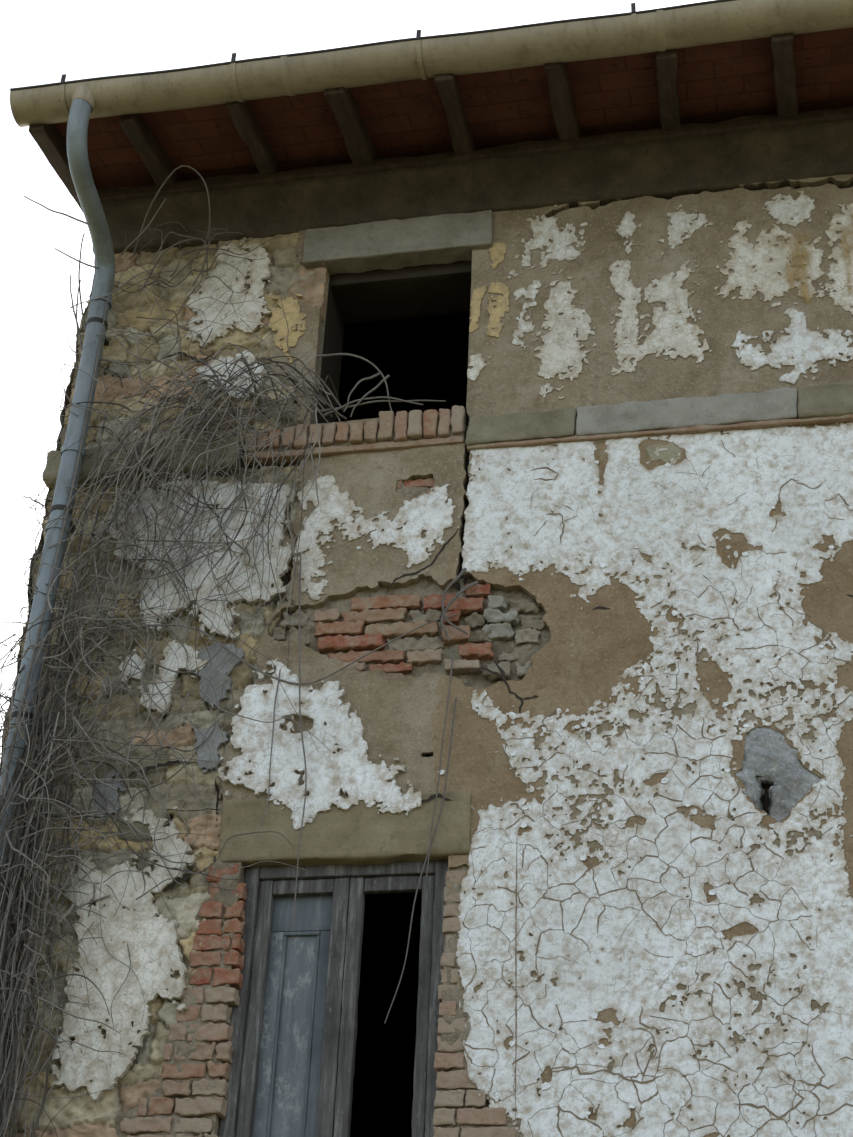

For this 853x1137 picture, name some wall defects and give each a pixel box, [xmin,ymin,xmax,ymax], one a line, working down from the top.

flaking render [186,237,306,400]
flaking render [467,205,596,400]
flaking render [608,211,712,376]
flaking render [714,191,853,385]
crack [653,440,759,507]
flaking render [712,529,763,569]
flaking render [100,475,682,1137]
crack [461,467,853,1137]
flaking render [695,657,739,714]
flaking render [725,535,853,906]
flaking render [51,806,247,1137]
flaking render [715,922,759,941]